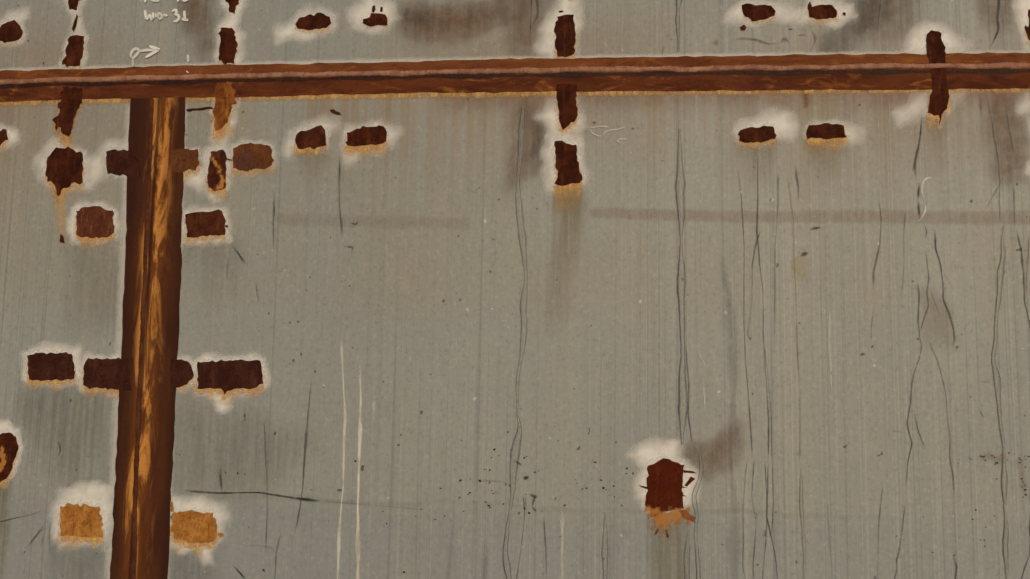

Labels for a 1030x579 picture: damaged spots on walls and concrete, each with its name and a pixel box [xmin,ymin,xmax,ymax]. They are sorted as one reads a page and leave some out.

rust [0,0,1030,80]
rust [894,68,964,124]
rust [946,69,1030,92]
rust [1017,94,1030,113]
rust [0,69,932,579]